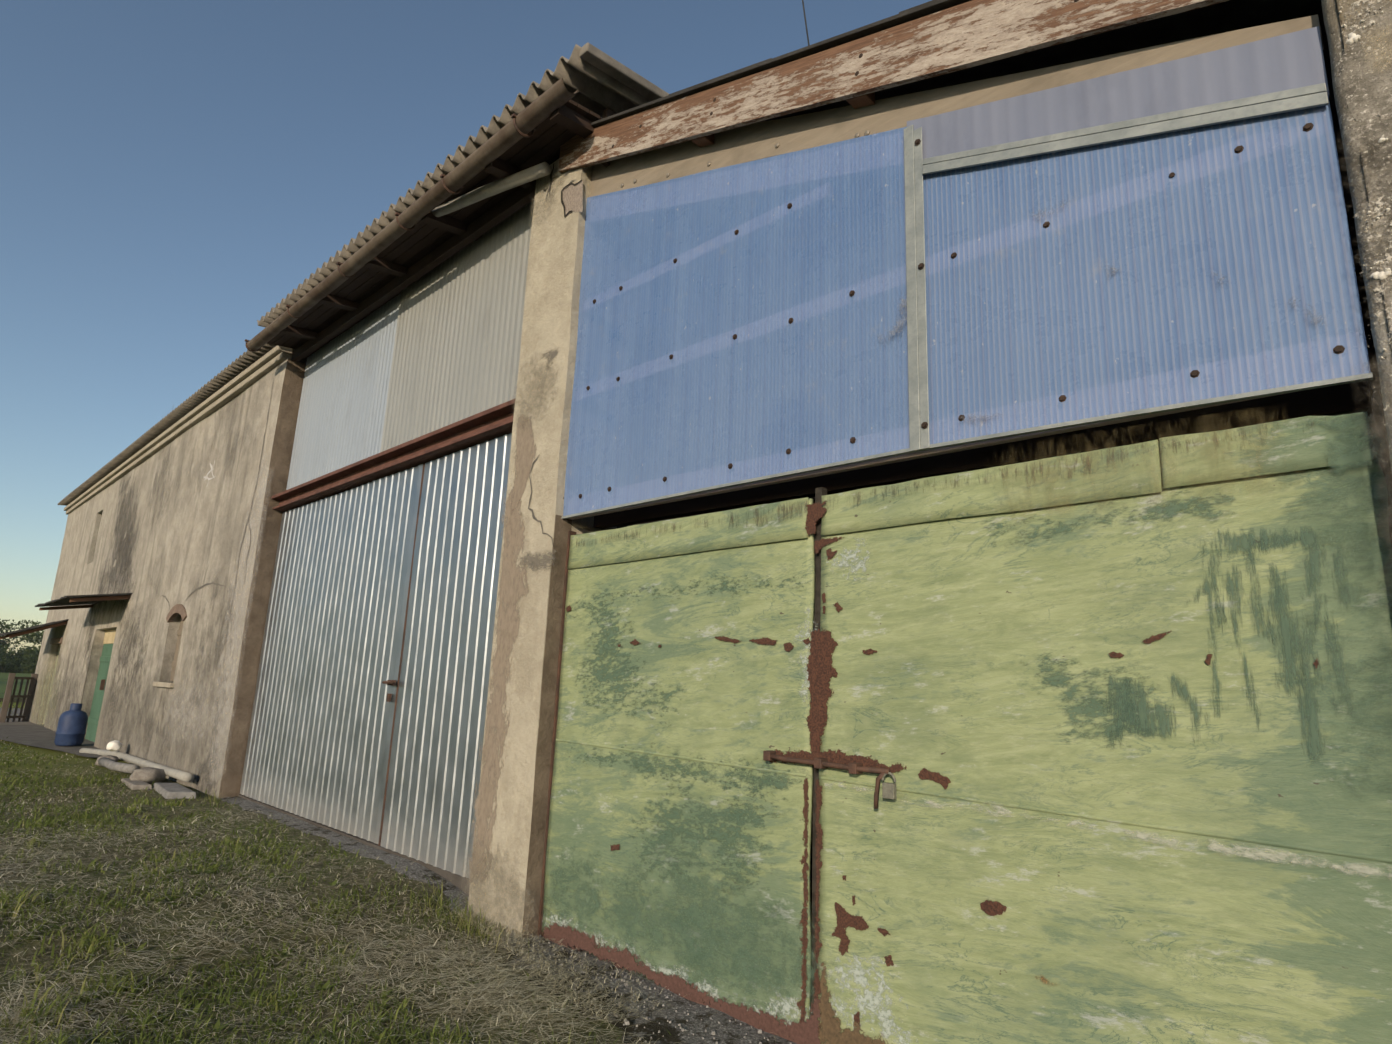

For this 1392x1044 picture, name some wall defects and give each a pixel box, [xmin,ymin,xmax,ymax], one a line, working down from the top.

crack [528,455,553,544]
rust [805,501,842,560]
rust [715,593,951,789]
rust [543,778,891,1044]
rust [980,900,1007,916]